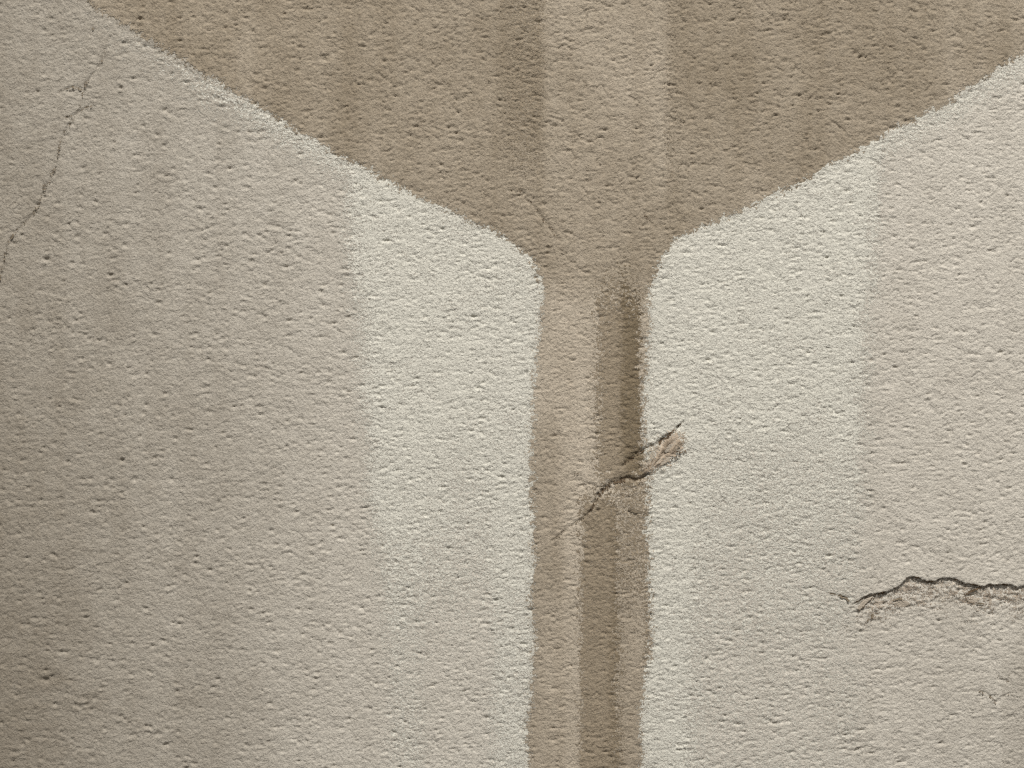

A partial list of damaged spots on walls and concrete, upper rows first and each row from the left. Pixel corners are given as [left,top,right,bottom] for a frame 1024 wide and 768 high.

crack [555,424,681,539]
crack [829,576,1017,622]